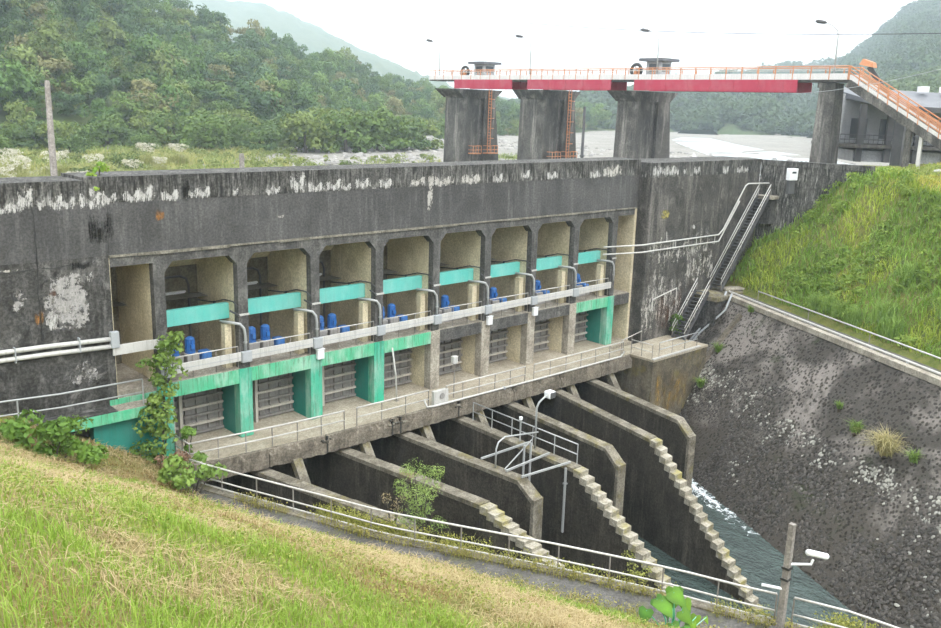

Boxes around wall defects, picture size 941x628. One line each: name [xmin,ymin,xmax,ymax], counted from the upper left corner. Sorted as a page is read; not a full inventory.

damp [88,214,114,243]
crack [0,204,68,342]
spalling [43,272,92,331]